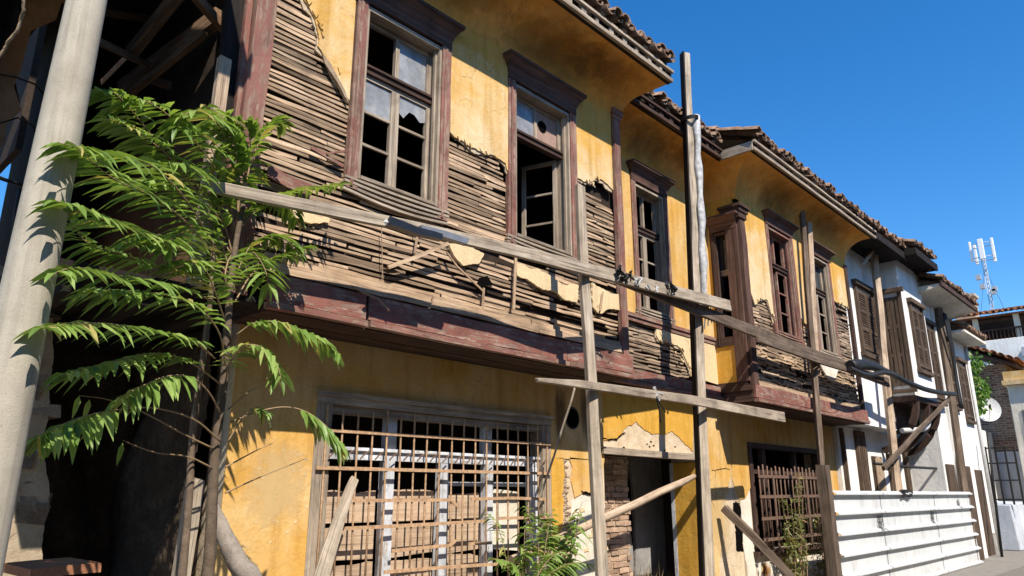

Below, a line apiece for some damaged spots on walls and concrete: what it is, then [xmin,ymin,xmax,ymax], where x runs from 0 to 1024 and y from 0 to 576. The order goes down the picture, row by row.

flaking render [251,0,691,378]
flaking render [752,297,778,333]
flaking render [756,302,861,409]
spalling [604,423,693,456]
flaking render [561,459,595,576]